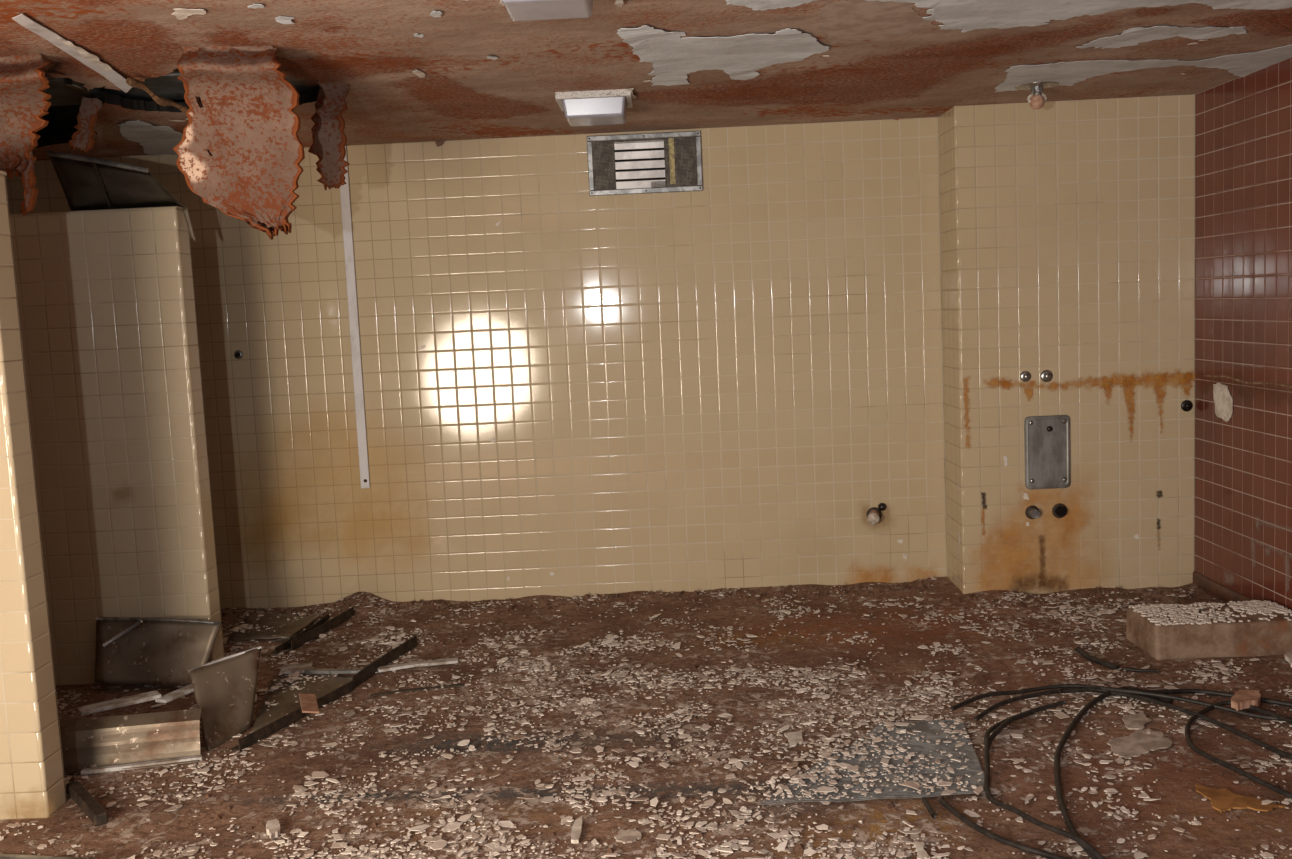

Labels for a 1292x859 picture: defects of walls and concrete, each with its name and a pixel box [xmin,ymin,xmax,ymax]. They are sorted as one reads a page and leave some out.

peeling [617,0,1292,92]
peeling [119,118,188,156]
rust [987,373,1195,433]